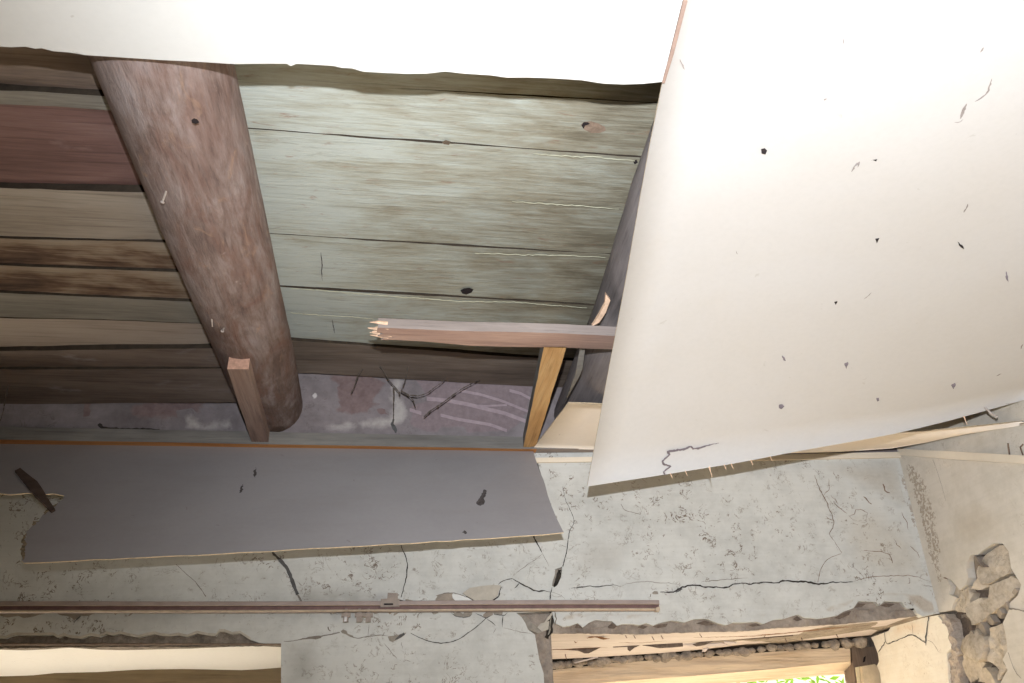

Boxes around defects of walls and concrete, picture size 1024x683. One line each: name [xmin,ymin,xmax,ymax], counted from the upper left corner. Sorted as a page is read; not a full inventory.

spalling [0,629,266,649]
crack [272,552,302,601]
crack [285,475,947,662]
spalling [432,585,917,683]
spalling [938,545,1021,683]